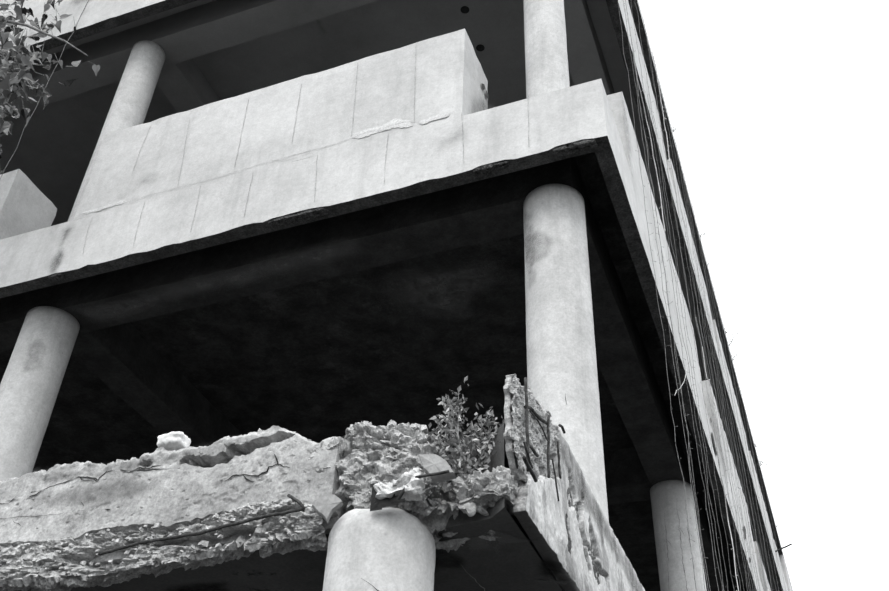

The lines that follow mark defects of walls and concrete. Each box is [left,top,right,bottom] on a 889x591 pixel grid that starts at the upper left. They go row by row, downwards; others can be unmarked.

peeling [352,112,449,139]
spalling [0,494,343,591]
crack [224,454,290,482]
spalling [407,465,521,553]
spalling [565,485,600,585]